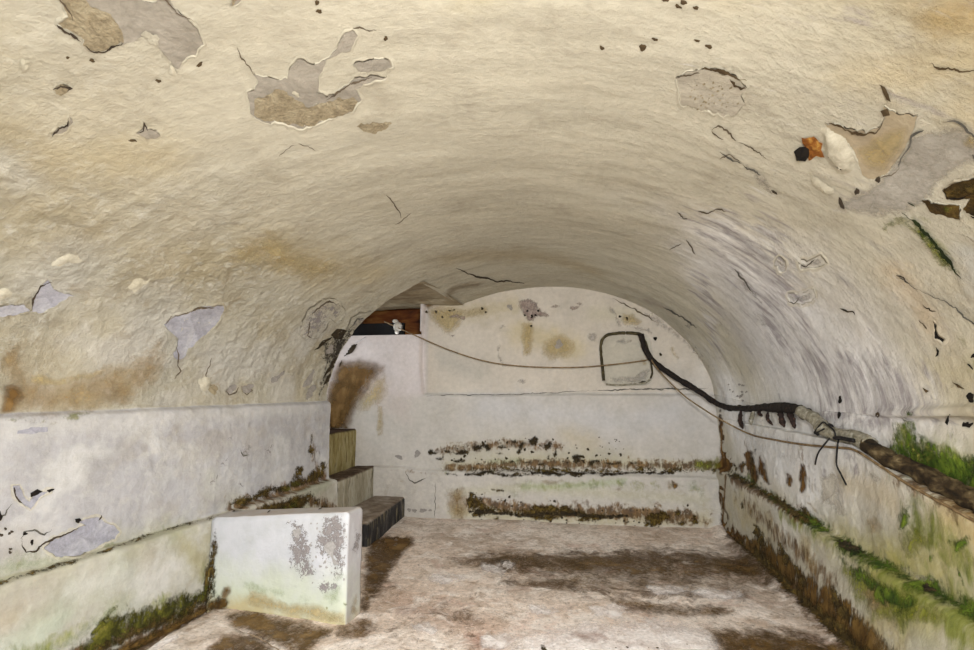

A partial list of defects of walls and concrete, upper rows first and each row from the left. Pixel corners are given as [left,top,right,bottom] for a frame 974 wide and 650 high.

peeling [54,0,207,83]
peeling [245,26,395,134]
peeling [824,85,974,222]
peeling [0,277,77,320]
peeling [161,302,227,376]
leakage [428,436,685,477]
leakage [452,492,698,527]
leakage [734,449,768,496]
leakage [784,464,806,501]
peeling [287,515,361,593]
leakage [207,536,413,650]
leakage [150,635,177,650]